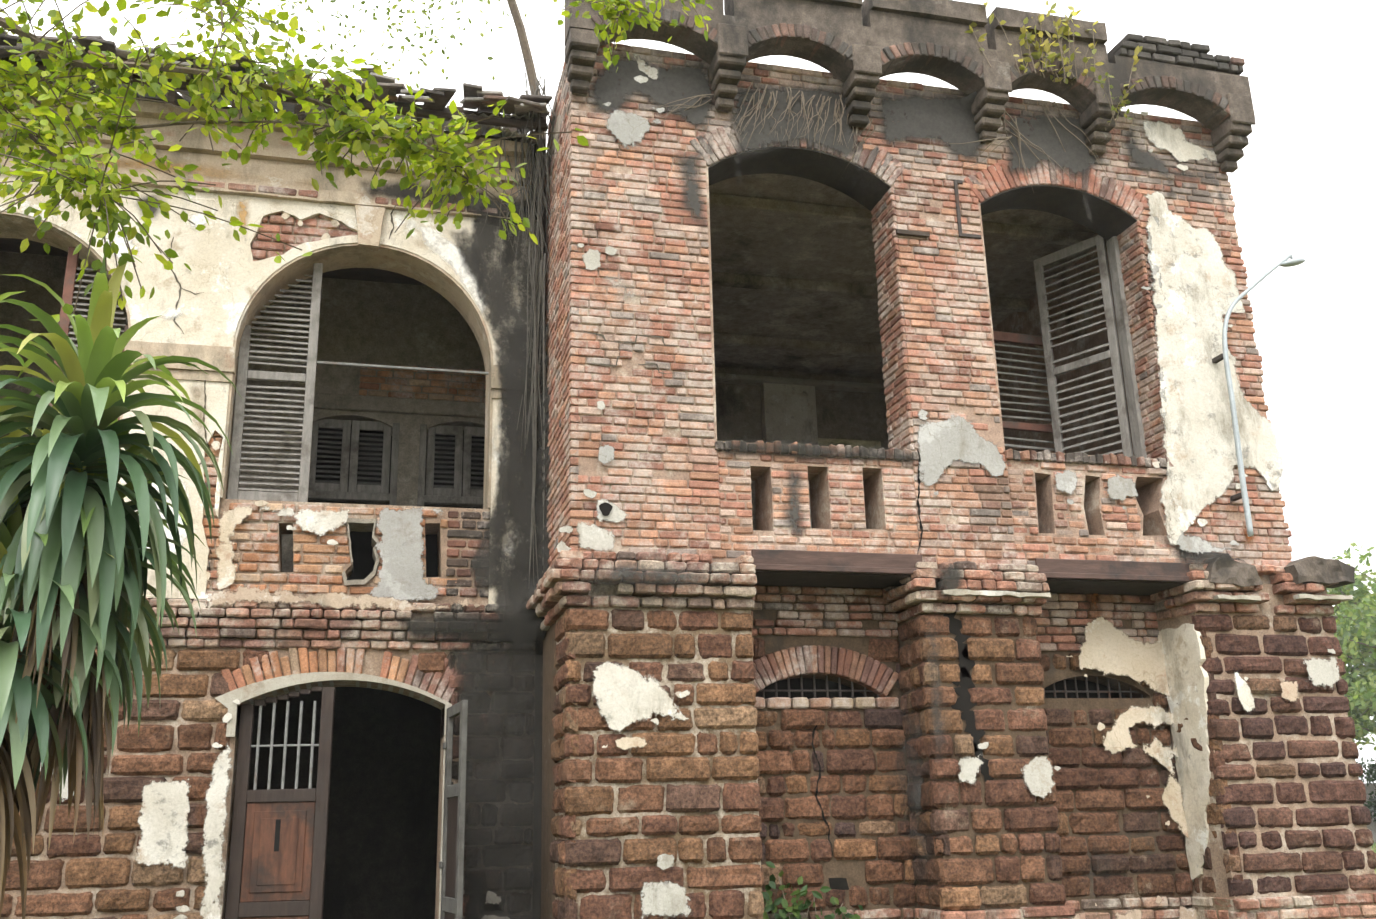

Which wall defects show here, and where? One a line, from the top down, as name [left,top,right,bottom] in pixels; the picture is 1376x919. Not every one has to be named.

flaking render [1141,112,1217,171]
peeling [152,483,188,554]
crack [169,237,204,334]
flaking render [192,431,480,616]
water stain [364,183,551,919]
flaking render [917,409,1006,495]
flaking render [1141,192,1284,554]
flaking render [135,699,240,919]
flaking render [592,661,690,750]
crack [811,725,833,856]
crack [942,602,994,782]
flaking render [1066,616,1211,881]